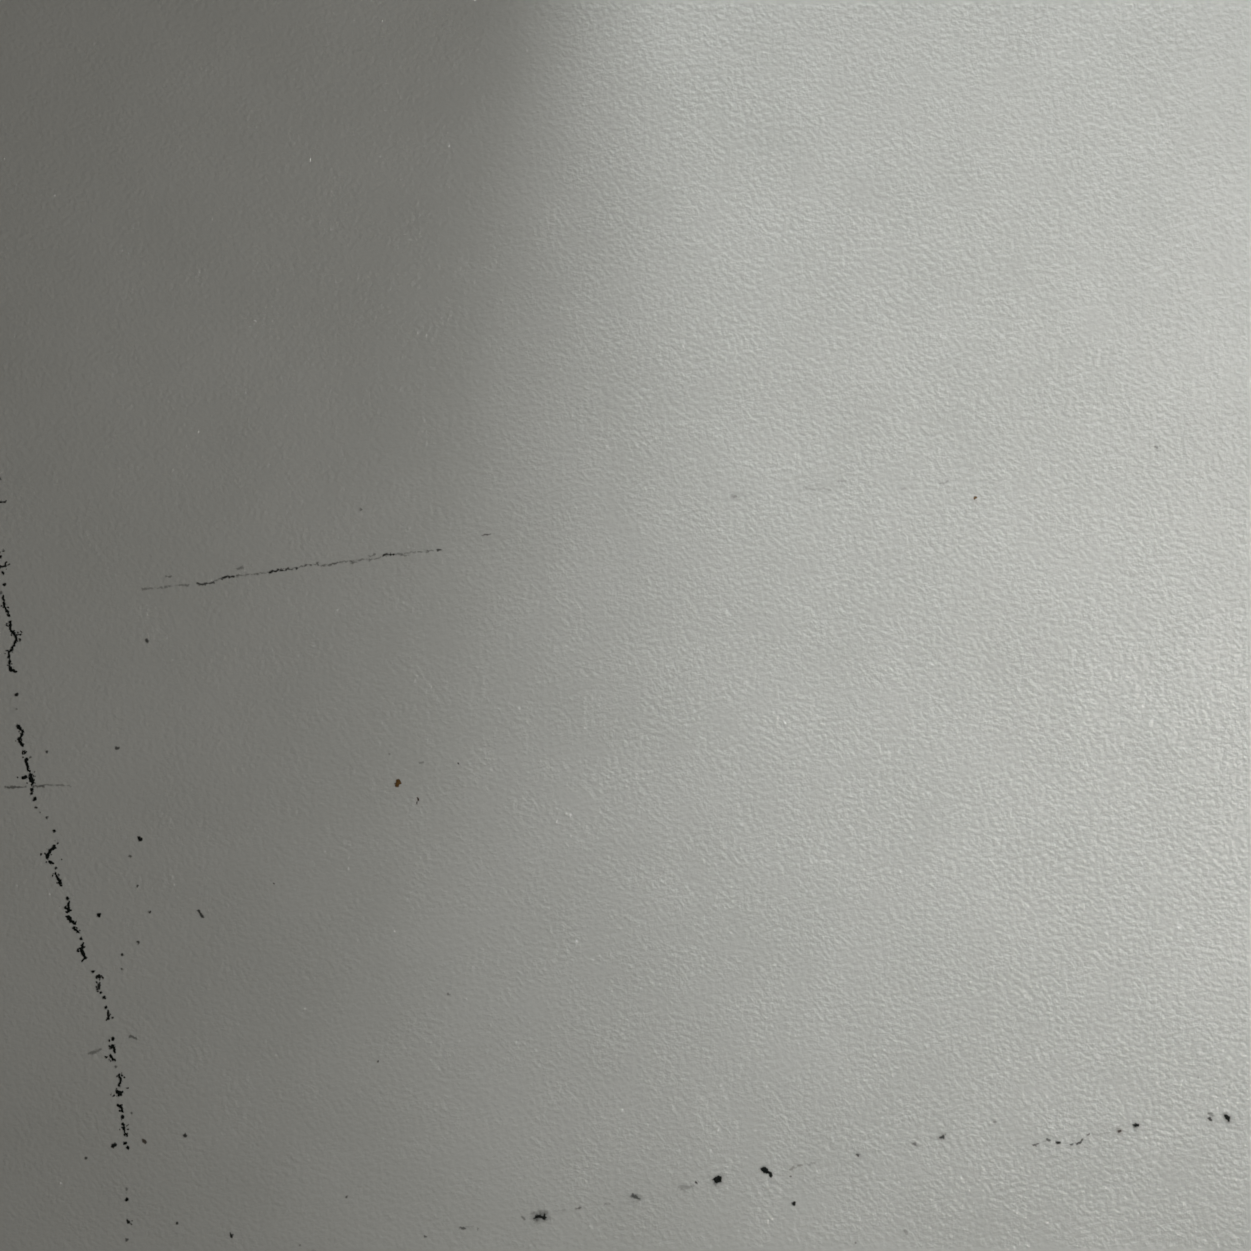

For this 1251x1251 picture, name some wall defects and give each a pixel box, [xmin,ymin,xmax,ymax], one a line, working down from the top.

crack [0,551,129,1150]
crack [1033,1123,1139,1146]
crack [695,1175,722,1184]
crack [761,1167,791,1177]